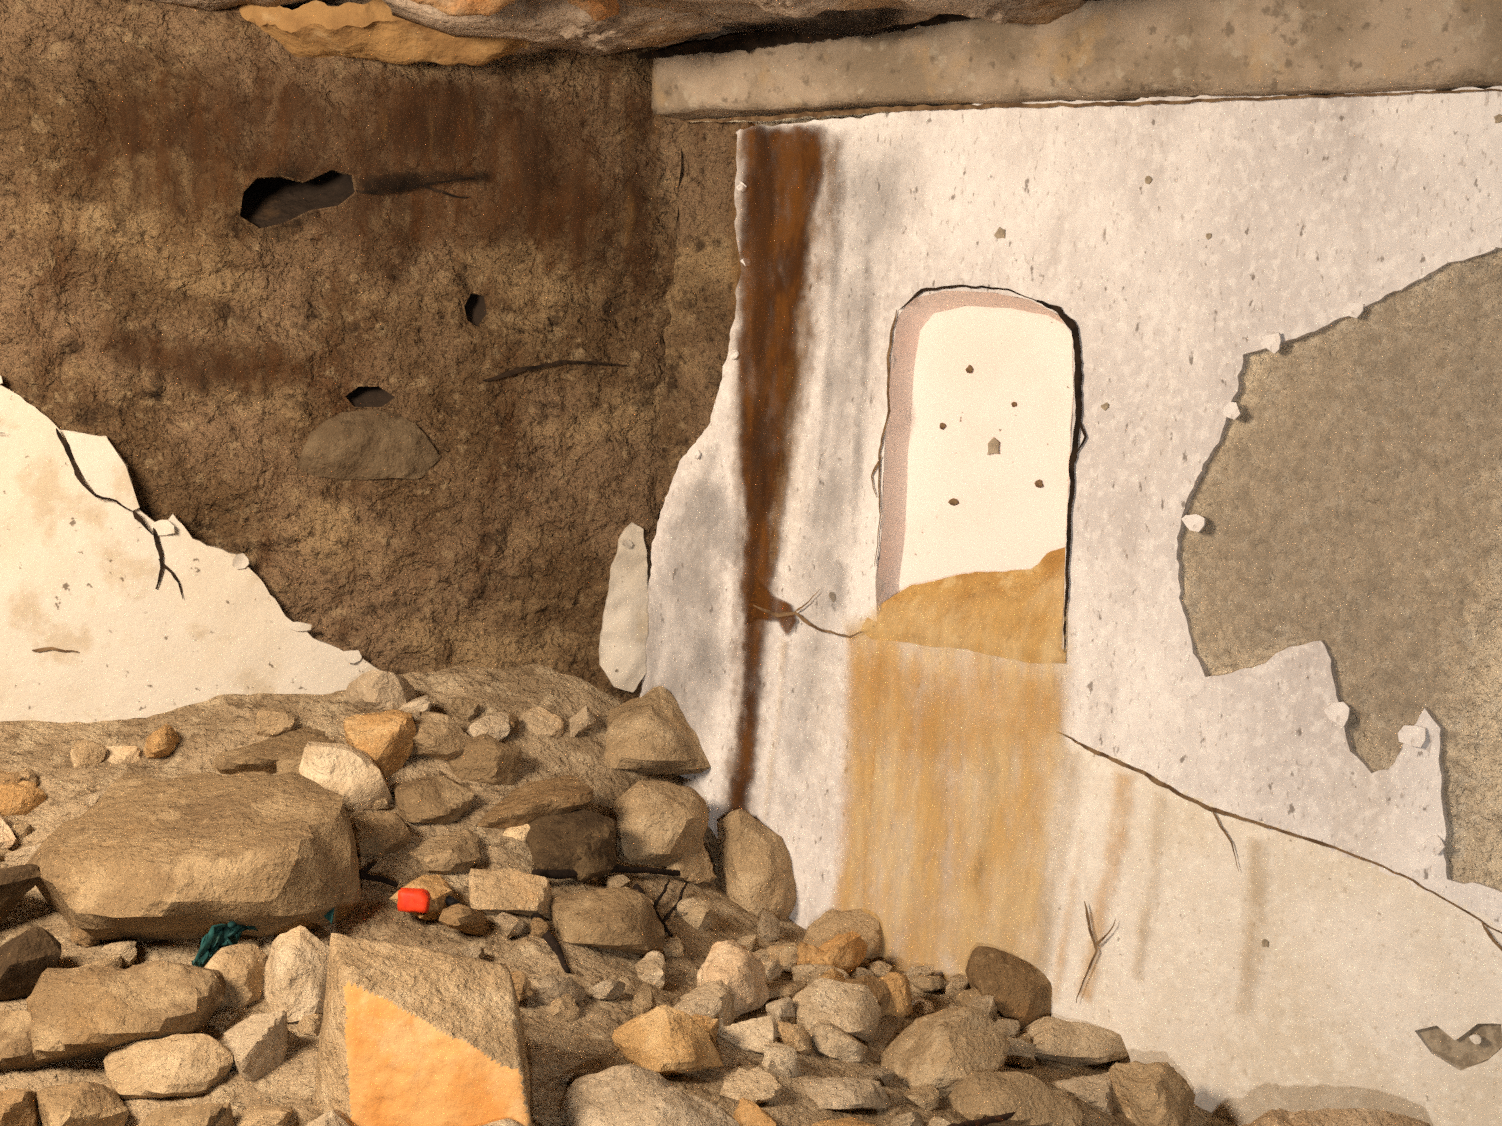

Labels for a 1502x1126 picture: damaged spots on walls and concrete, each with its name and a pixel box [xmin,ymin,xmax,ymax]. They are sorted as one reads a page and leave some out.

crack [56,428,183,599]
spalling [0,0,753,723]
rust [728,125,838,812]
spalling [1181,218,1502,890]
water stain [841,578,1064,979]
crack [1057,732,1502,951]
spalling [1418,1023,1502,1069]